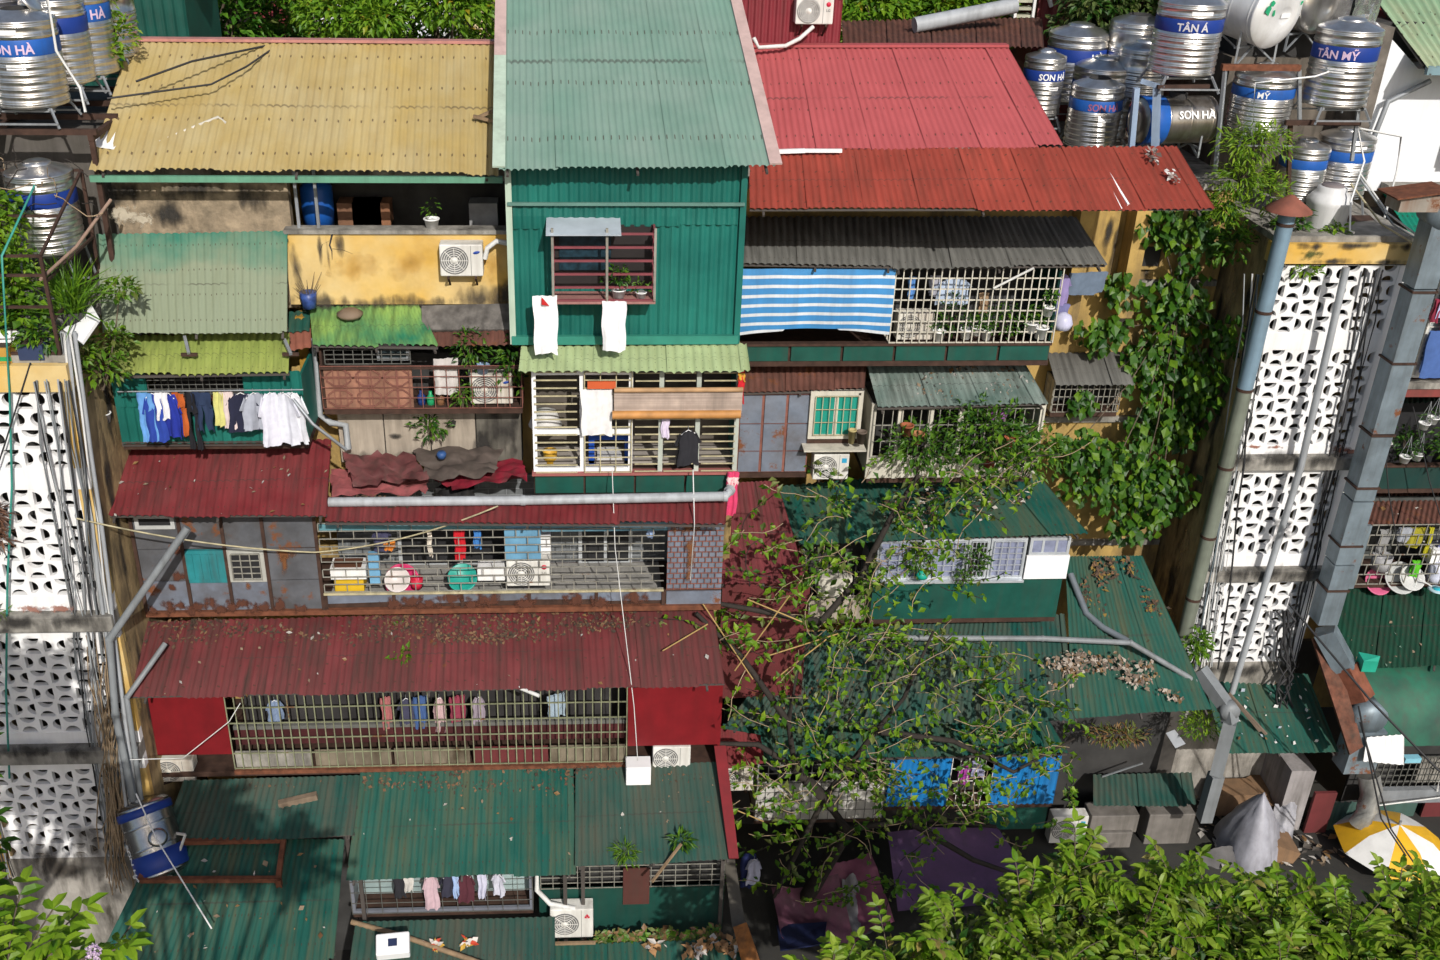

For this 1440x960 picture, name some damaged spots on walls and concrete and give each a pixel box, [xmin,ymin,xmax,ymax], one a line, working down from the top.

damp [107,185,137,203]
damp [159,182,208,223]
damp [238,186,258,207]
damp [316,296,331,309]
damp [468,284,509,304]
rust [278,549,293,570]
rust [150,572,307,616]